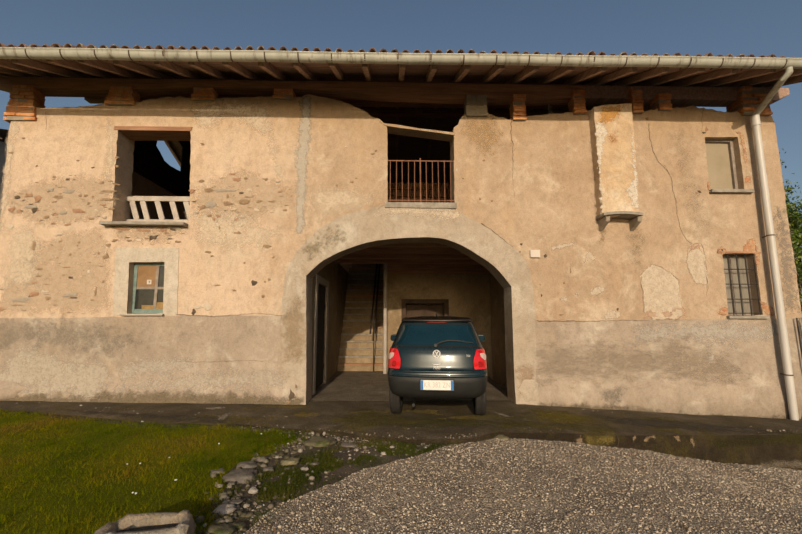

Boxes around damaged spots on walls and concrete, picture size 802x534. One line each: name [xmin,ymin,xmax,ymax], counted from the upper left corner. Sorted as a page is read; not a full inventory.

flaking render [0,121,185,247]
flaking render [188,172,292,234]
peeling [595,122,608,213]
peeling [626,127,640,208]
flaking render [640,265,685,320]
spalling [743,238,760,271]